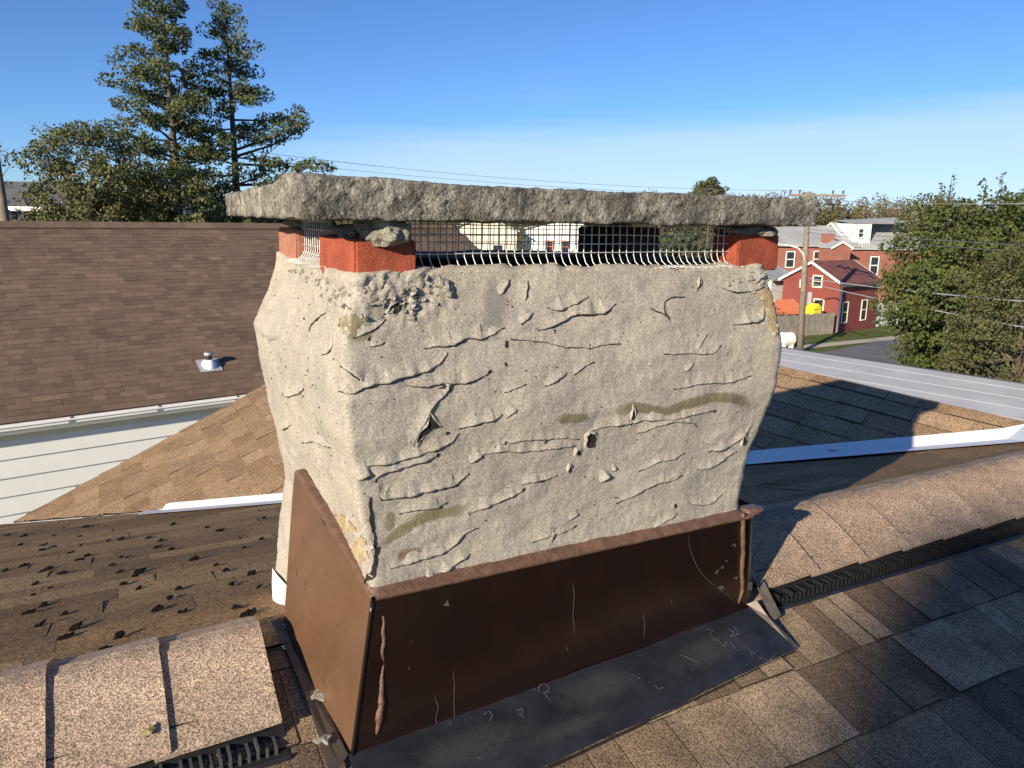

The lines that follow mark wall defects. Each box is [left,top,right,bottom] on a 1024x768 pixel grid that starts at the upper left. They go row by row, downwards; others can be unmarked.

spalling [271,264,439,331]
crack [278,366,330,468]
crack [307,265,768,584]
leakage [559,414,587,423]
leakage [618,393,745,415]
peeling [334,511,383,569]
leakage [386,506,460,540]